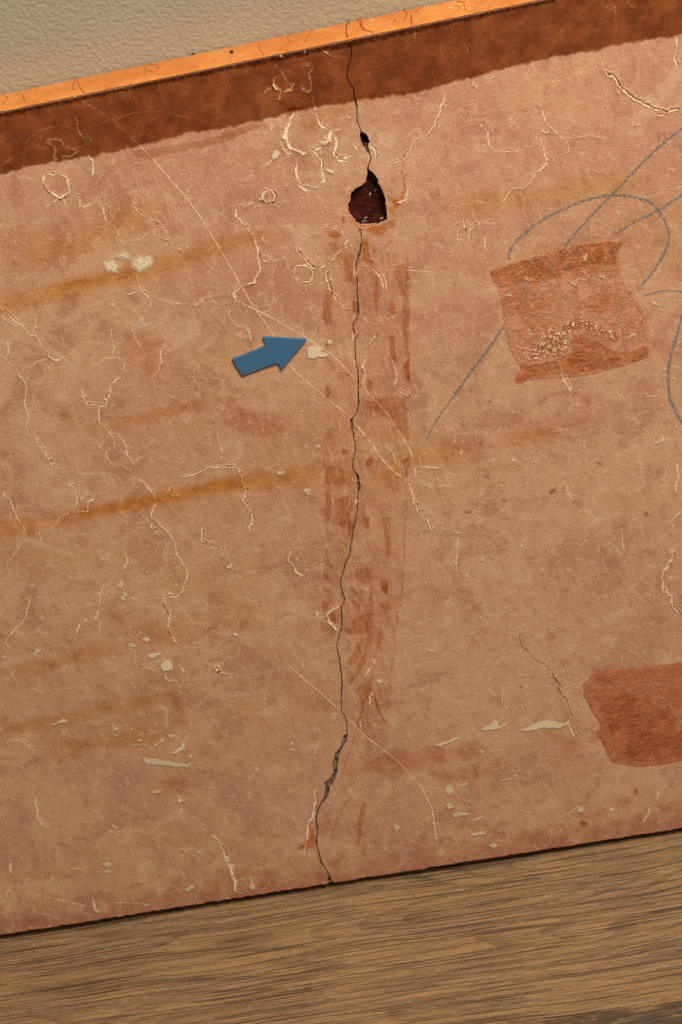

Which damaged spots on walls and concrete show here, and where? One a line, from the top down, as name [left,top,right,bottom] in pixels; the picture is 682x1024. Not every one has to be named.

crack [302,229,474,878]